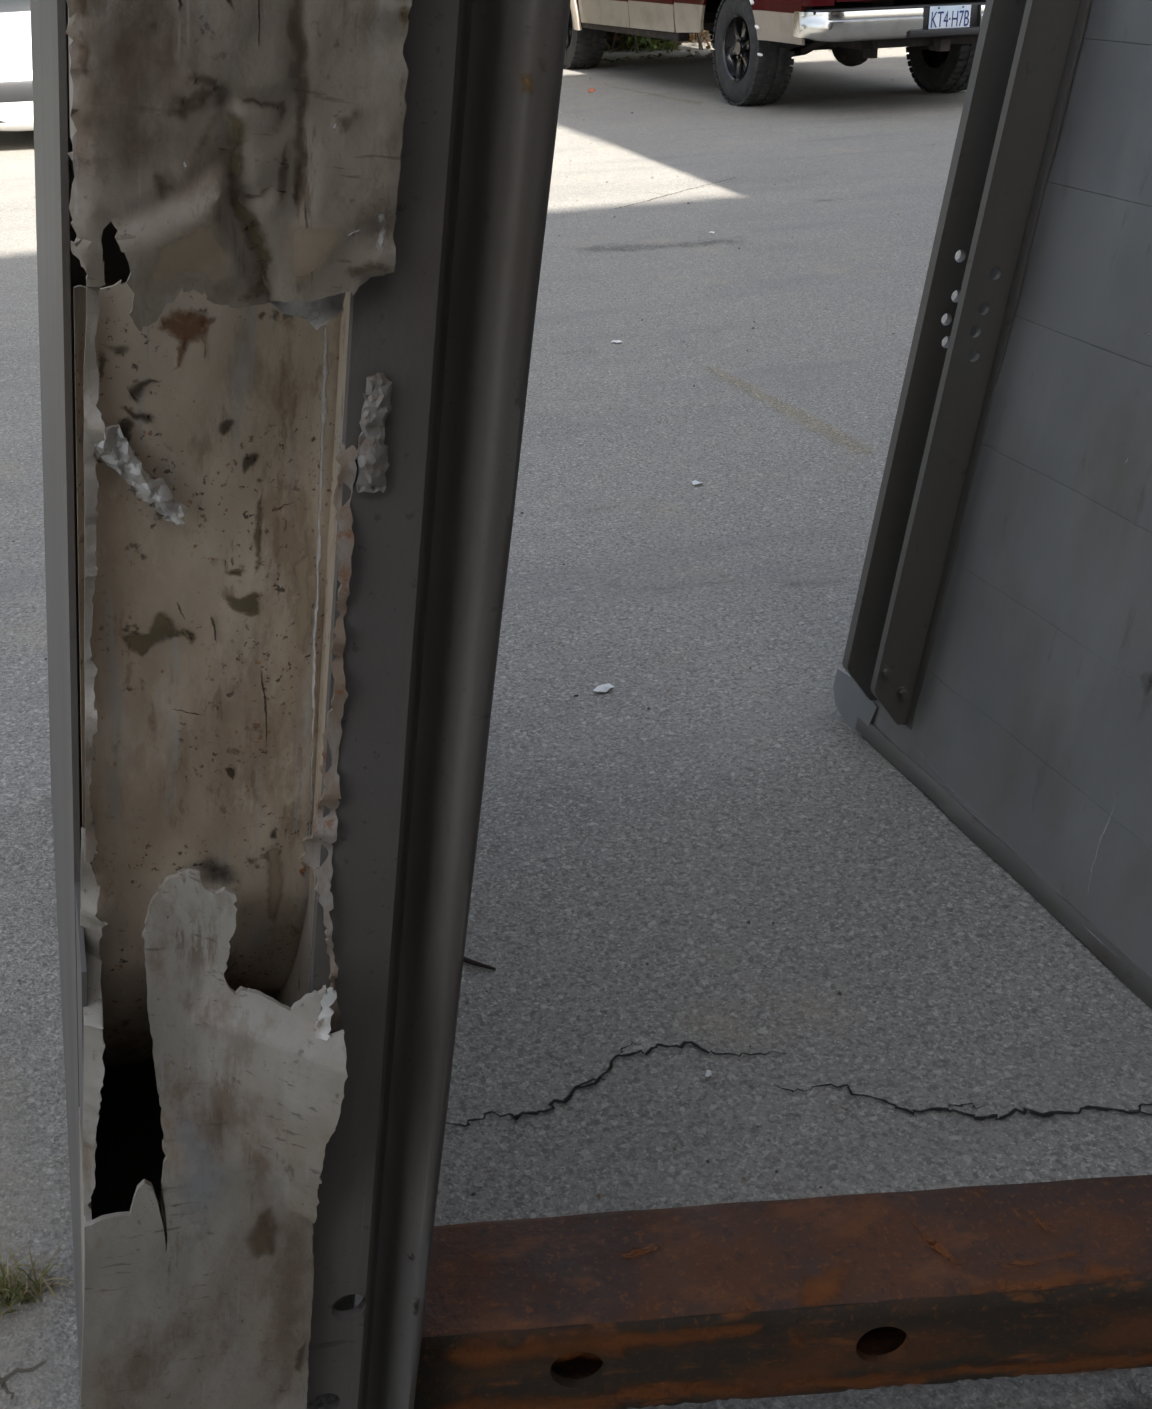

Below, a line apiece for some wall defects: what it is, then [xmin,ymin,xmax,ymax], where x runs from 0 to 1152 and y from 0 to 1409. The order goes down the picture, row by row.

corrosion [161,312,214,367]
peeling [95,424,188,525]
peeling [356,372,392,493]
peeling [313,987,337,1041]
crack [446,1041,1152,1127]